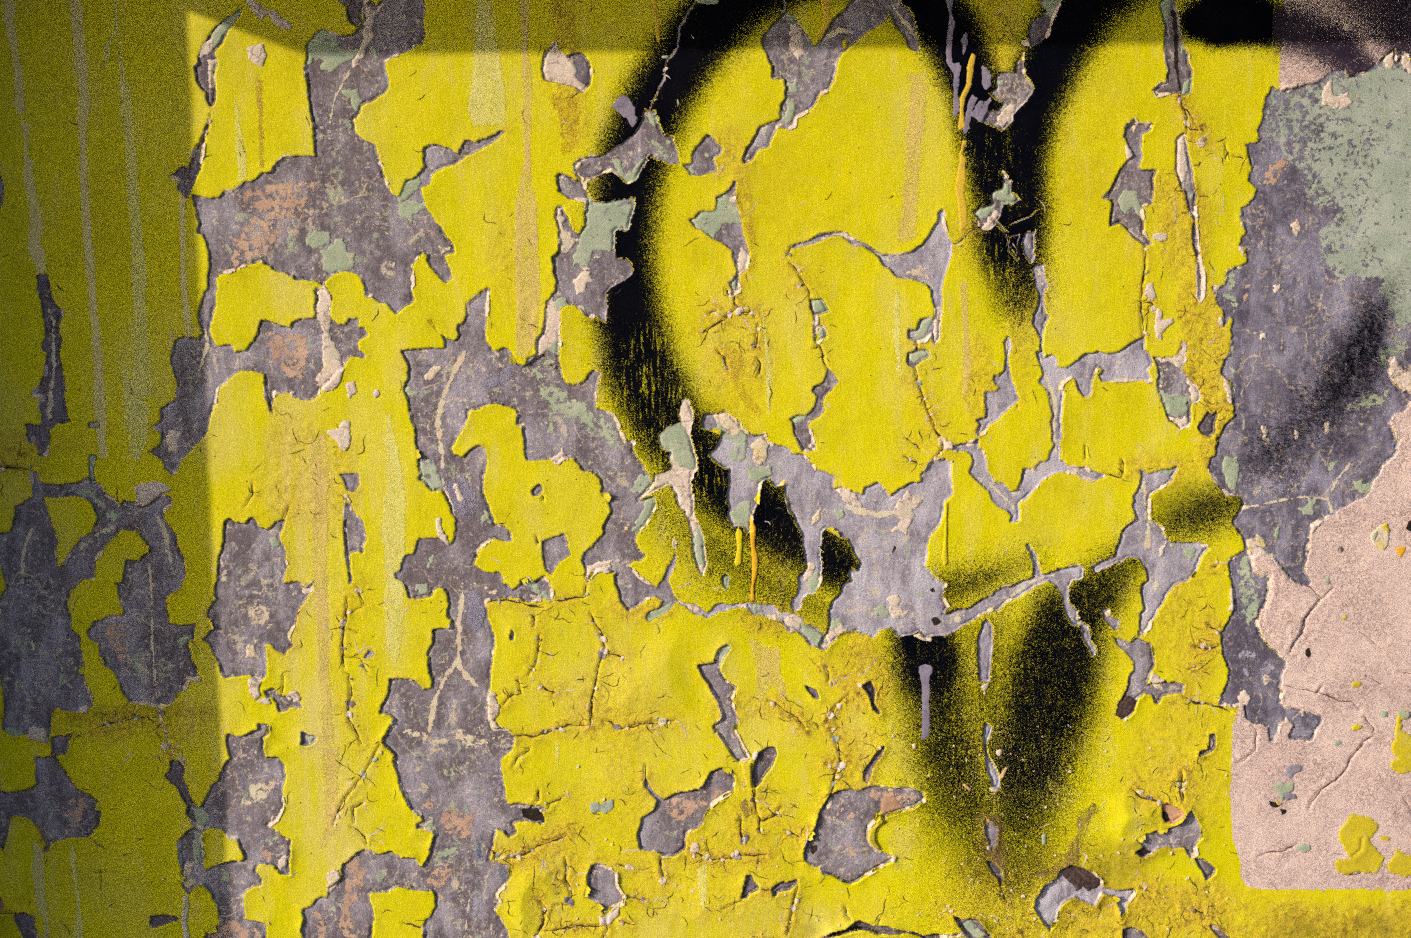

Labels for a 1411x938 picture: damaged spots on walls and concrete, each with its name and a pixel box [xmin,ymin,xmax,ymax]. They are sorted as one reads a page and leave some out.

crack [493,42,573,80]
peeling [541,41,594,93]
peeling [743,0,919,163]
crack [984,7,1024,44]
peeling [986,0,1062,131]
peeling [1153,0,1193,98]
peeling [0,0,505,938]
crack [245,407,365,538]
peeling [301,50,1411,938]
crack [1084,337,1228,482]
crack [677,507,789,631]
crack [490,557,1298,938]